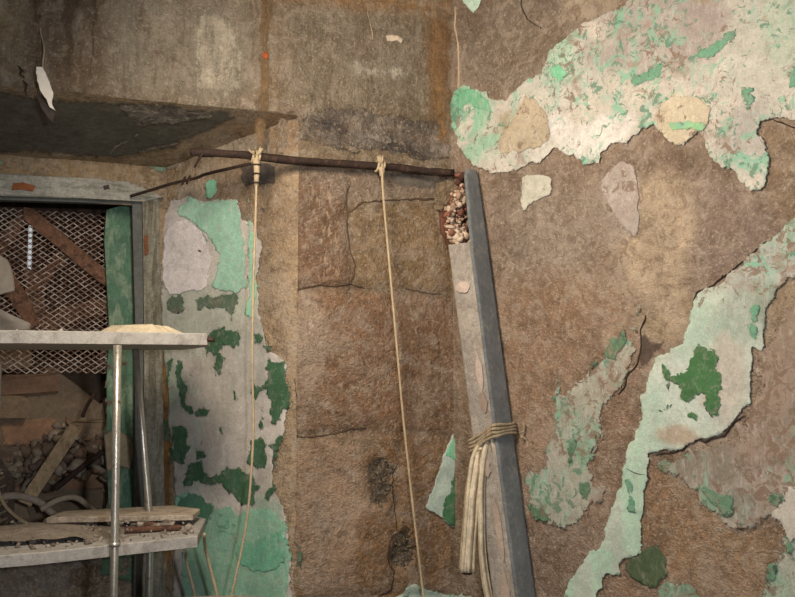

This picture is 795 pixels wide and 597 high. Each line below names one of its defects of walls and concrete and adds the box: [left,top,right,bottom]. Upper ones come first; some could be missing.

peeling [298,0,795,210]
crack [298,184,435,291]
peeling [601,161,640,238]
peeling [161,179,304,597]
crack [297,427,365,438]
peeling [524,305,641,529]
crack [618,315,646,395]
peeling [564,218,795,597]
crack [656,415,745,455]
crack [378,464,398,597]